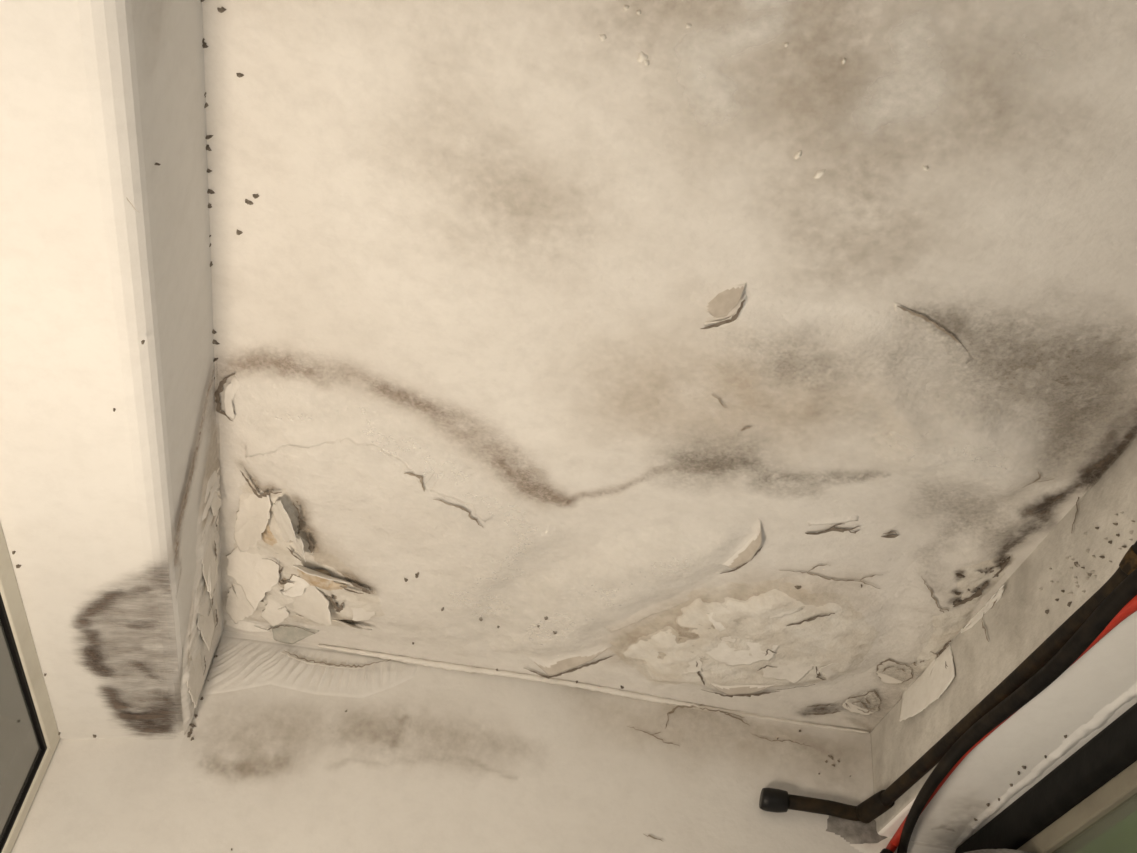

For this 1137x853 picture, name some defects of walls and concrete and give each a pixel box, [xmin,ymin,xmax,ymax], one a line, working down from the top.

peeling [700,283,747,329]
water stain [999,426,1137,558]
water stain [76,580,177,733]
flaking render [180,459,418,741]
flaking render [525,518,881,697]
peeling [804,554,1016,721]